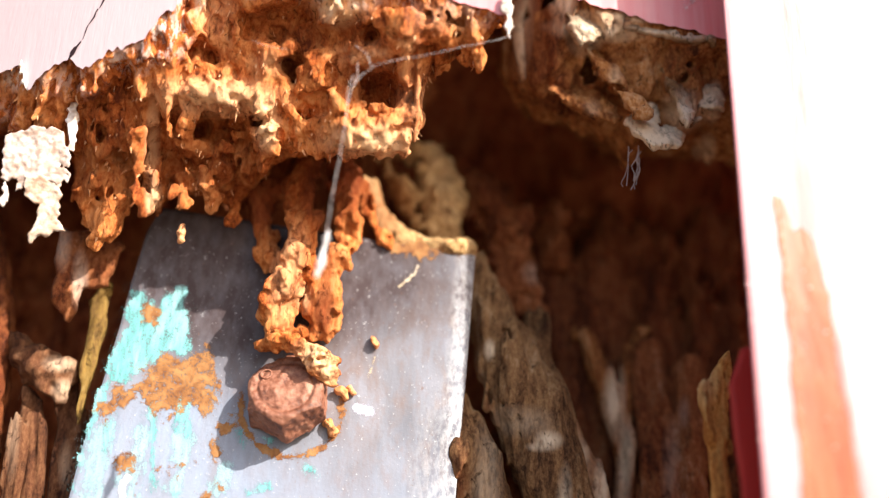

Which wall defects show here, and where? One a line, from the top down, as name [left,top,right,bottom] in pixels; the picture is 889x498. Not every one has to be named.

crack [68,0,105,60]
peeling [500,0,515,39]
peeling [19,60,28,91]
peeling [0,102,80,244]
rust [389,237,452,262]
rust [138,298,163,328]
peeling [67,284,200,498]
rust [91,339,349,463]
rust [107,445,137,476]
peeling [199,458,237,498]